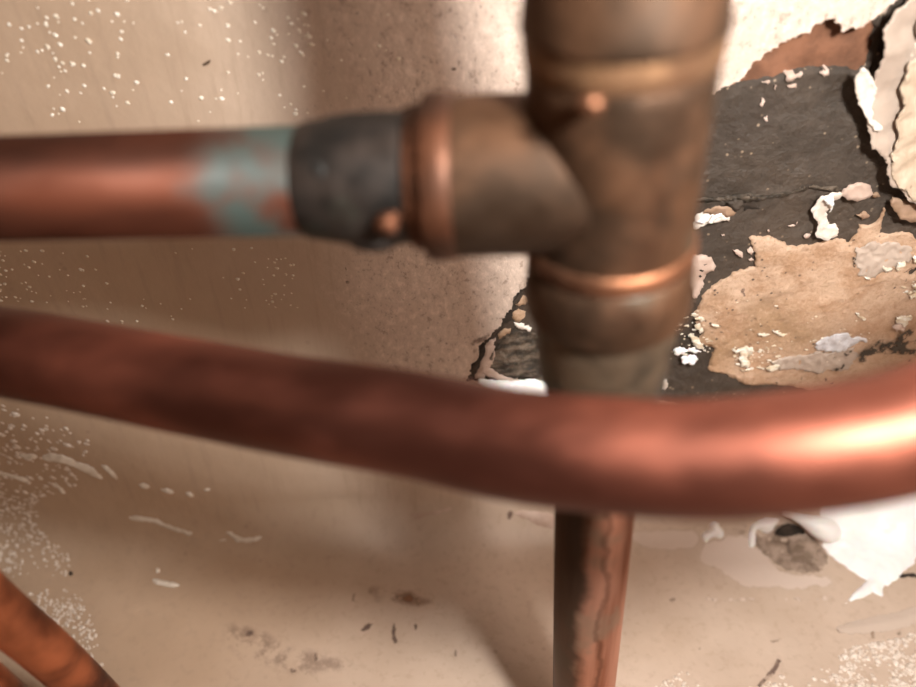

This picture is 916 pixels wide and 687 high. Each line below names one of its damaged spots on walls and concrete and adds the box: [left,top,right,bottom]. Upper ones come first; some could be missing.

spalling [659,0,916,398]
spalling [463,274,542,382]
spalling [756,523,828,574]